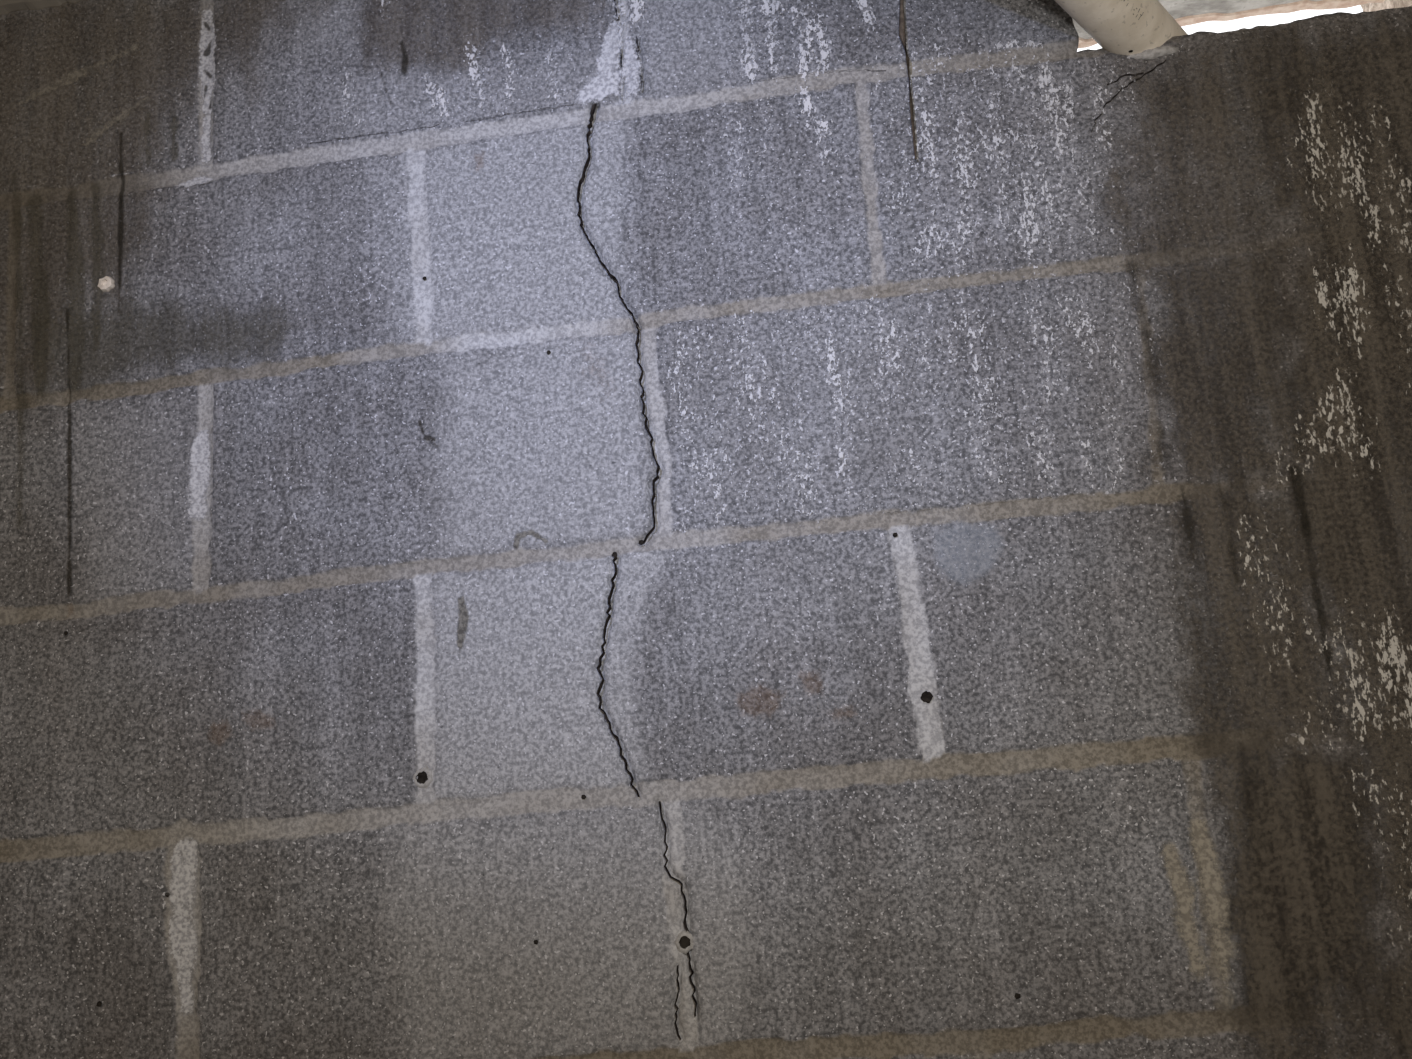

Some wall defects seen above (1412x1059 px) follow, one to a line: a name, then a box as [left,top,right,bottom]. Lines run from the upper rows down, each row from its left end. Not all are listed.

crack [310,0,697,1040]
damp [668,0,1412,1059]